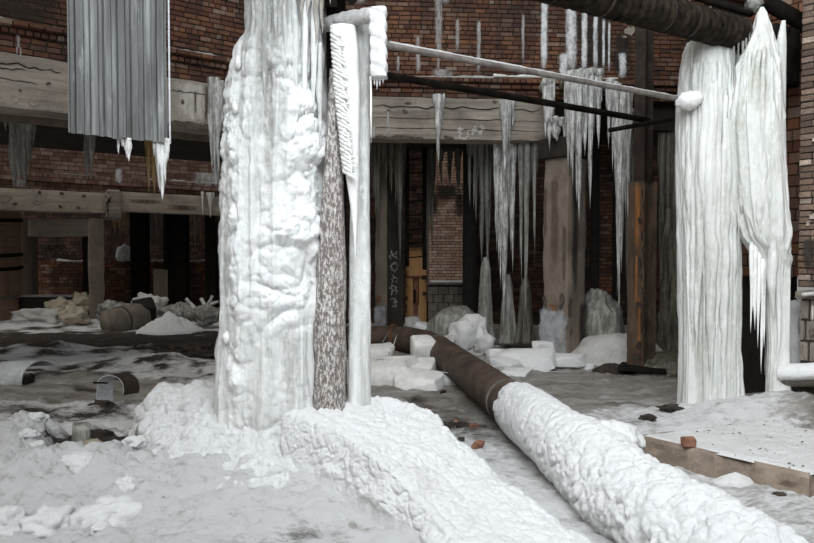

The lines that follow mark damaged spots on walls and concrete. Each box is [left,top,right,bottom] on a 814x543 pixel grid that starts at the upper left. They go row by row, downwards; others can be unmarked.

crack [0,62,61,85]